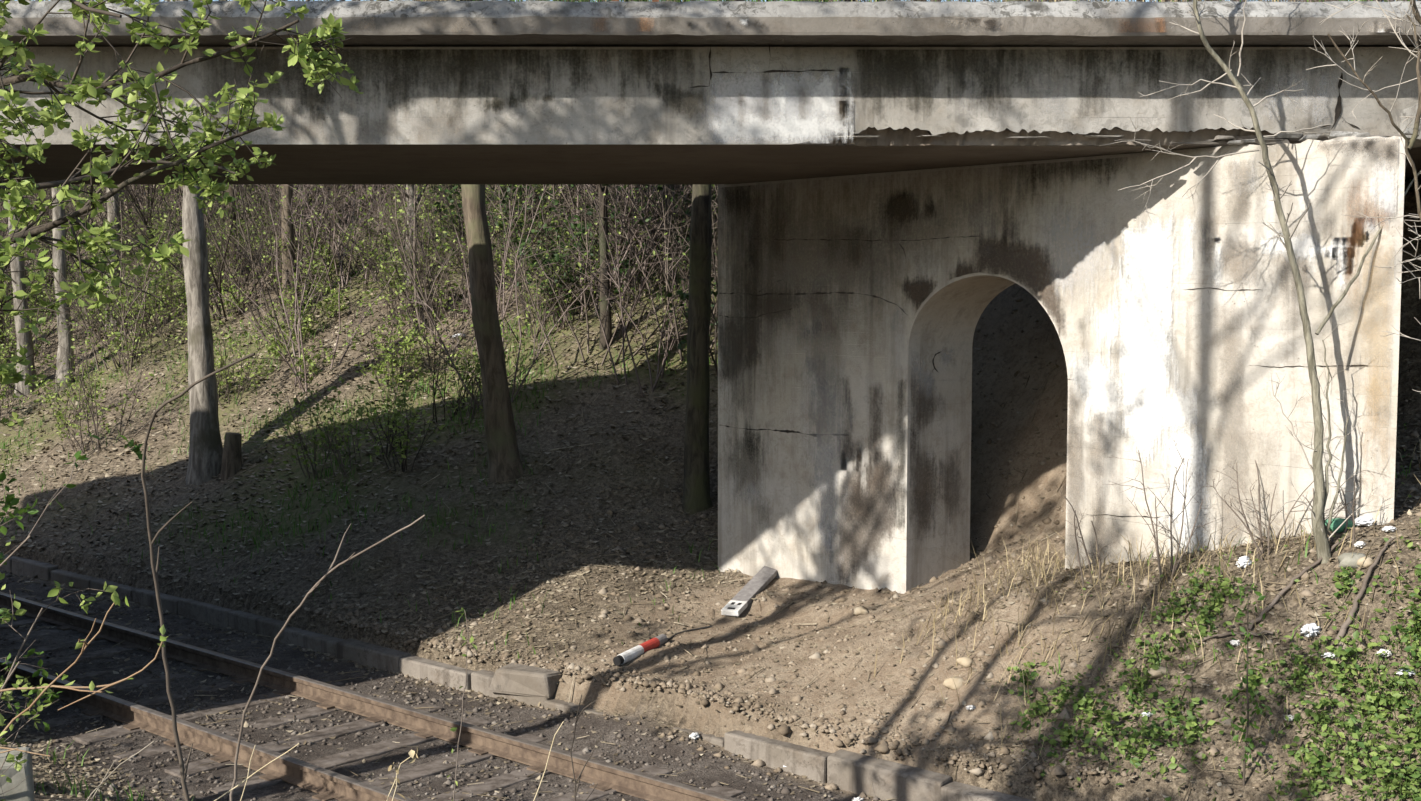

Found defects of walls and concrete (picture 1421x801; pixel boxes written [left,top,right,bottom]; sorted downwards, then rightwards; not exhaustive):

water stain [223,49,587,110]
water stain [666,69,852,143]
water stain [885,191,936,223]
spalling [799,127,1420,217]
water stain [904,279,936,307]
water stain [951,211,1064,332]
water stain [836,383,935,578]